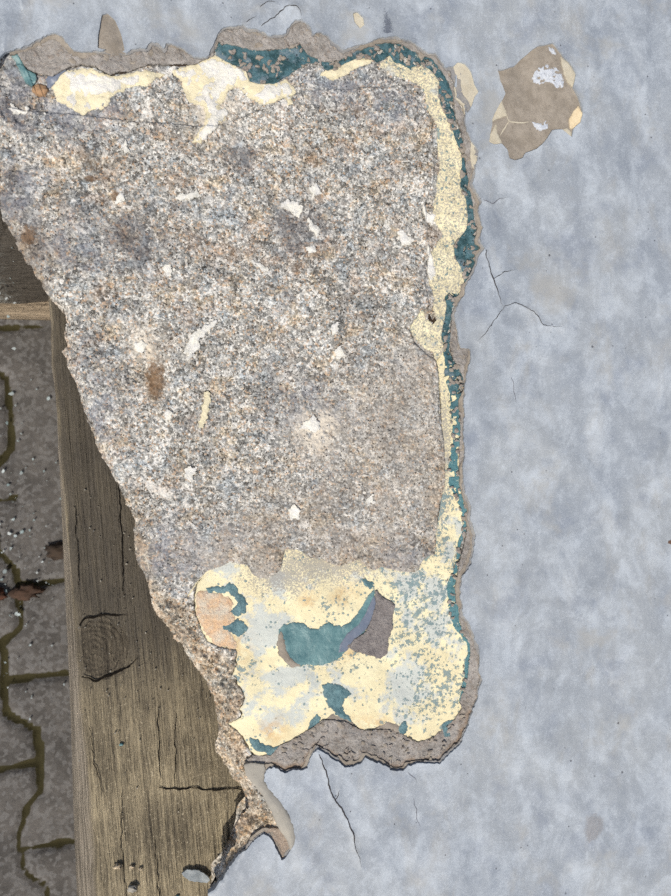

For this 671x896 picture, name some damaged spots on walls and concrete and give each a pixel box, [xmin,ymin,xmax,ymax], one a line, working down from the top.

peeling [489,44,582,160]
crack [483,243,560,336]
spalling [0,13,484,888]
crack [319,755,361,863]